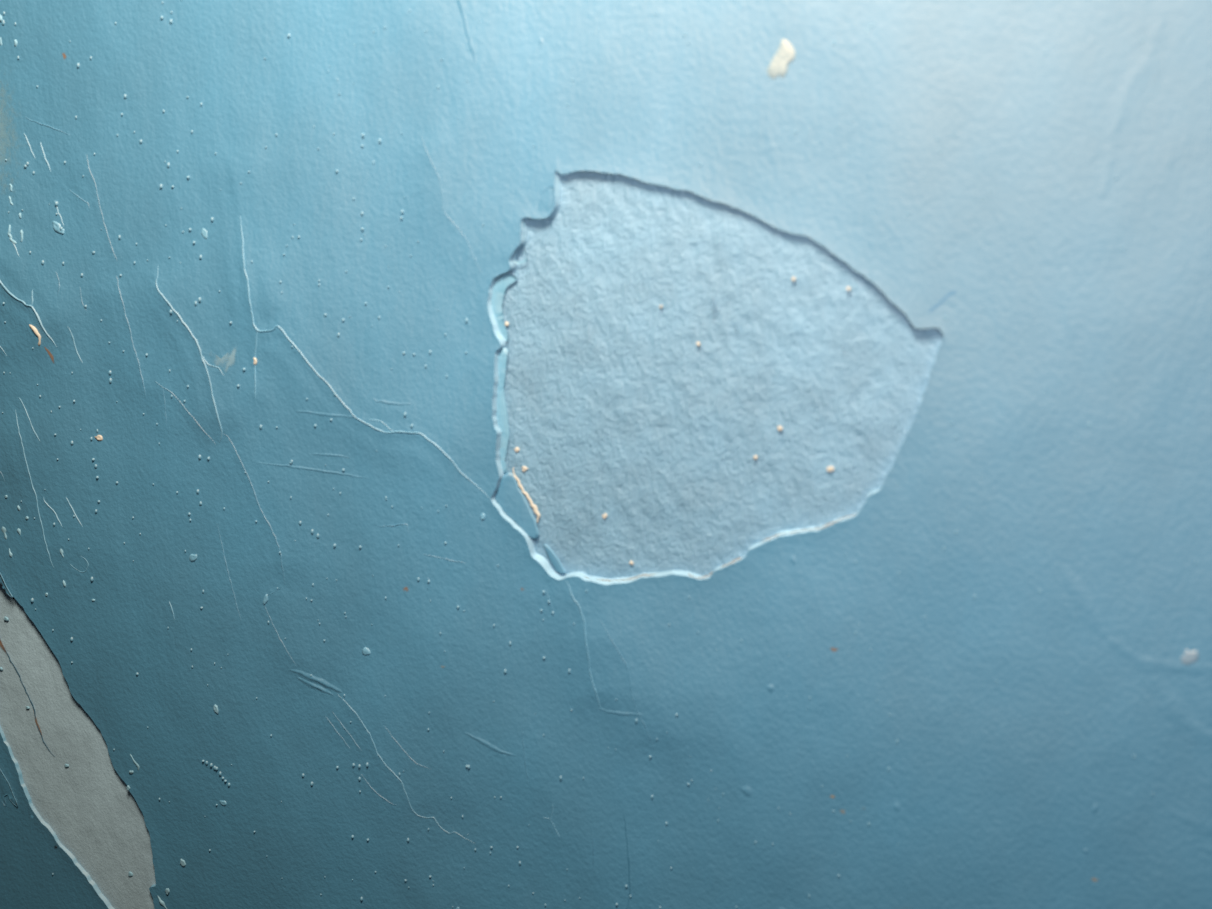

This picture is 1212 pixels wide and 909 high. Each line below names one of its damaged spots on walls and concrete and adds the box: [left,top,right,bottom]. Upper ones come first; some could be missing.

crack [0,397,53,566]
crack [0,280,57,347]
crack [86,154,296,665]
crack [240,217,491,500]
peeling [480,170,943,585]
peeling [0,573,170,909]
crack [338,695,475,844]